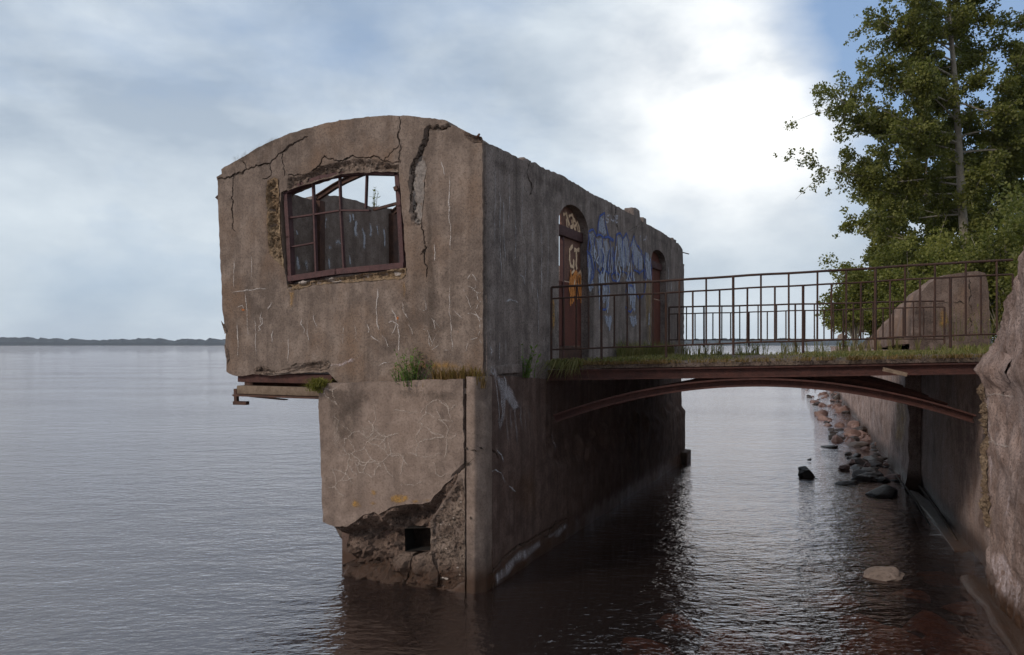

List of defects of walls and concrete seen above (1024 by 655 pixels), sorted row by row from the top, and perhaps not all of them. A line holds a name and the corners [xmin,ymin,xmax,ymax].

spalling [266,177,284,268]
crack [221,120,451,275]
spalling [413,155,427,224]
crack [324,388,497,496]
spalling [336,473,466,623]